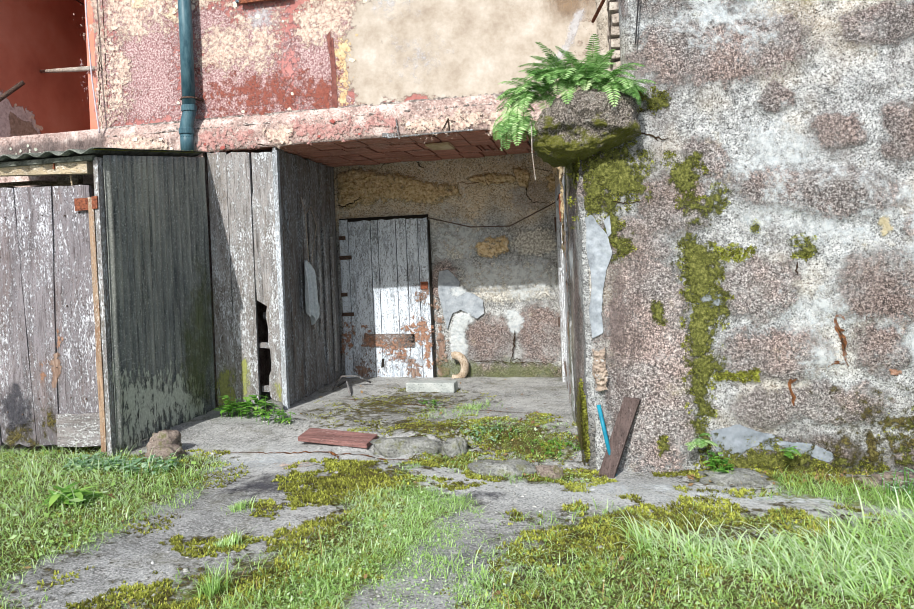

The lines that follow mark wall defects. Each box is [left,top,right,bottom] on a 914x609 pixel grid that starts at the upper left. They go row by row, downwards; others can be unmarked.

peeling [80,0,182,150]
peeling [191,0,538,158]
peeling [0,90,43,137]
spalling [336,167,462,211]
crack [467,330,557,365]
damp [0,383,57,451]
damp [809,385,914,472]